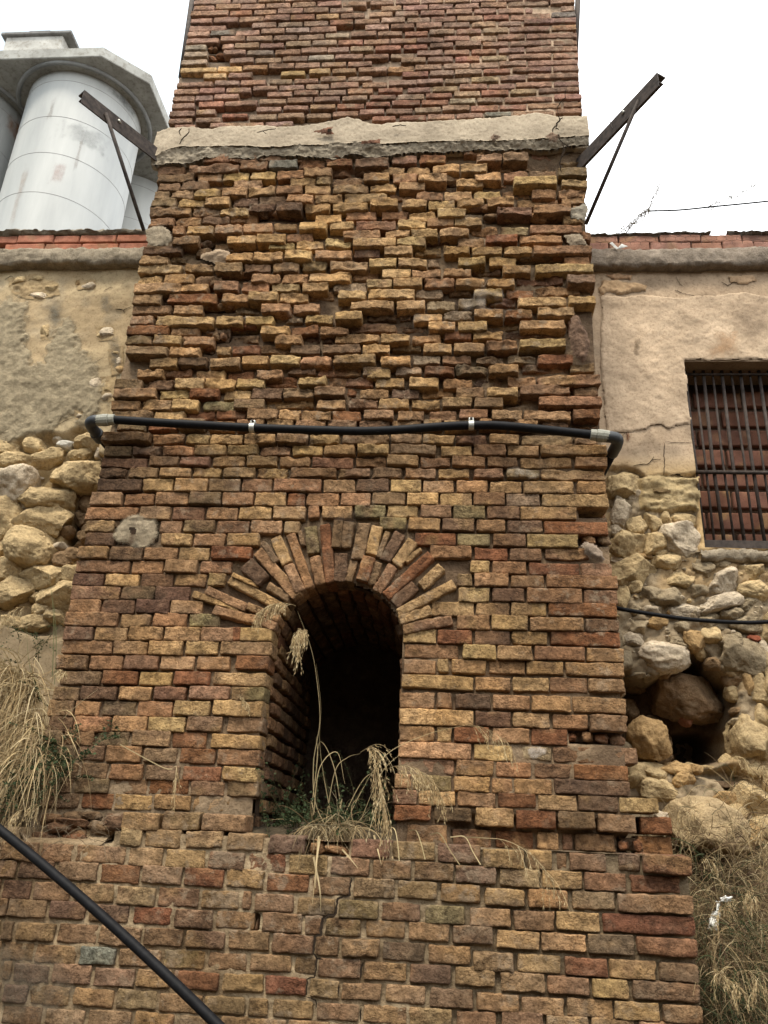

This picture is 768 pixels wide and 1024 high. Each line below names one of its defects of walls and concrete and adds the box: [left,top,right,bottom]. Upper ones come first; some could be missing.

crack [552,85,570,172]
spalling [7,273,60,301]
spalling [73,279,97,290]
crack [634,441,695,478]